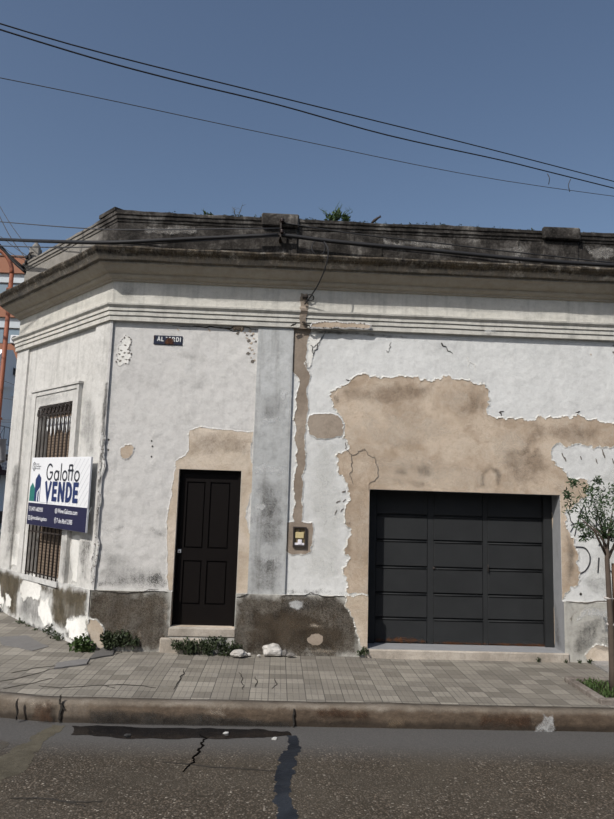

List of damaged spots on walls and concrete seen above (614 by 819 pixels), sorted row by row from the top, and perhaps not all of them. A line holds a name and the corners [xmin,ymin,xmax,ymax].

peeling [115,334,133,367]
peeling [119,443,135,461]
peeling [287,320,614,650]
water stain [0,572,22,614]
water stain [39,584,169,650]
water stain [234,591,358,656]